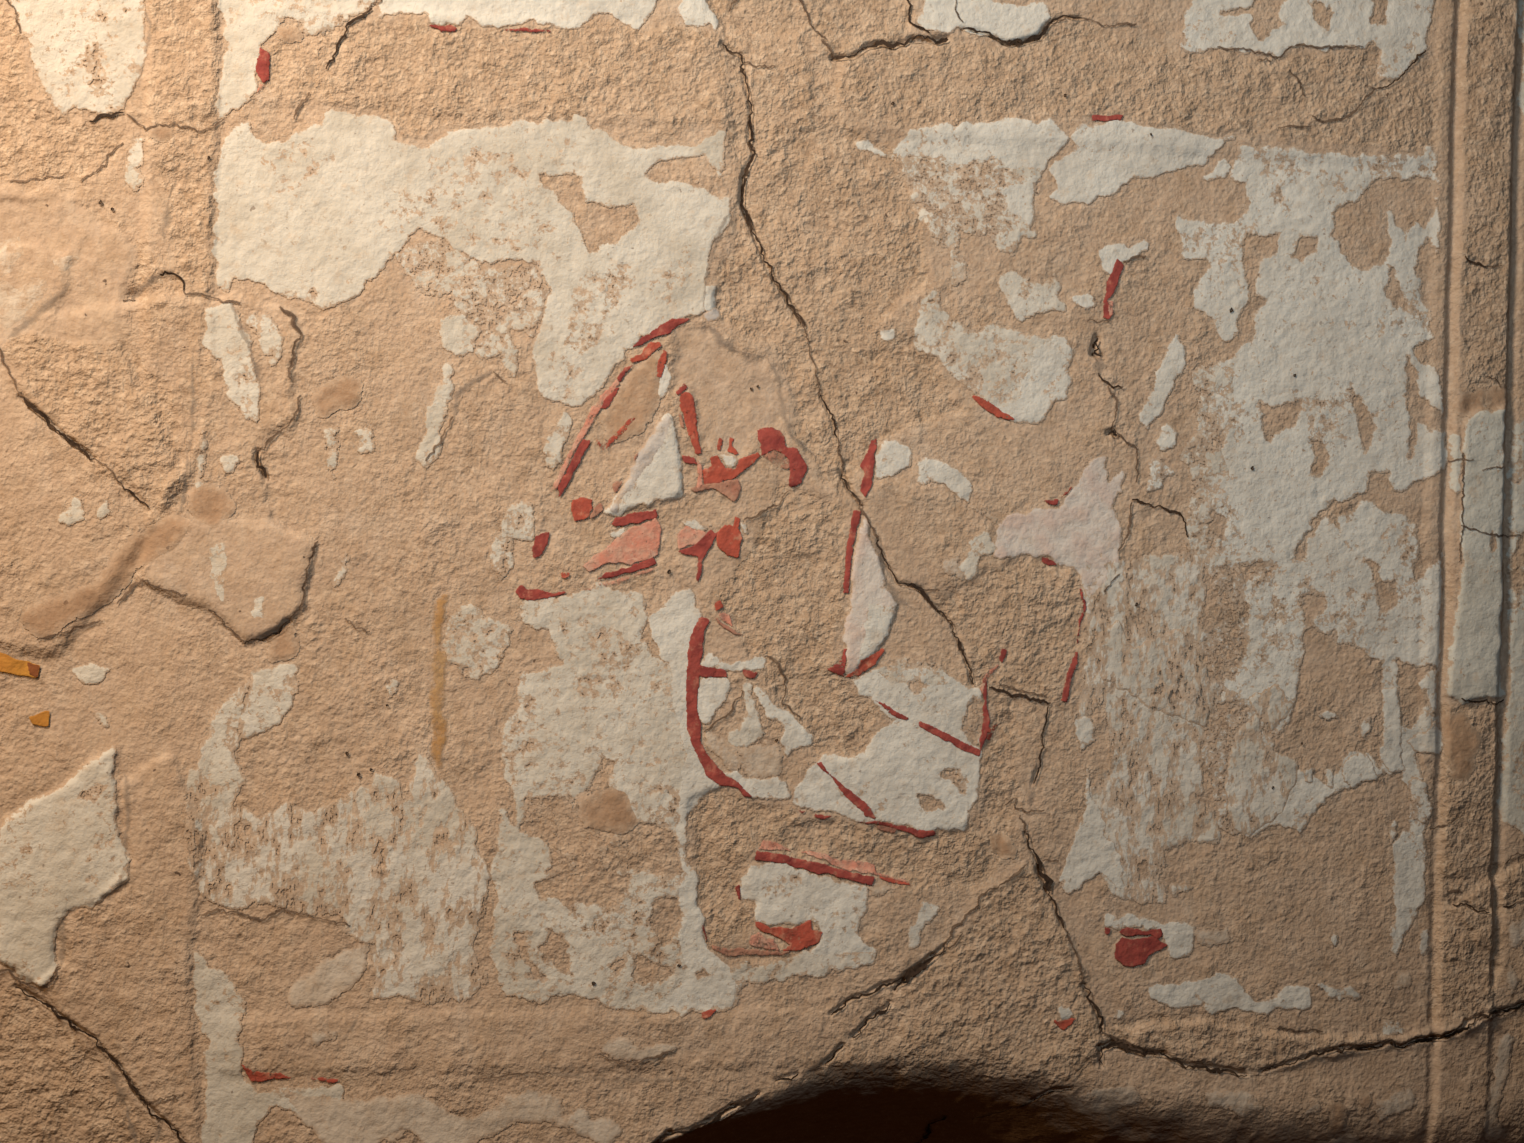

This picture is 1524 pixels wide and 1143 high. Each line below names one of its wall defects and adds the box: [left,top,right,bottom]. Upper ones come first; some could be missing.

crack [0,349,149,507]
peeling [0,712,181,1143]
crack [0,966,186,1143]
crack [10,112,224,183]
crack [256,306,303,478]
crack [294,0,382,119]
peeling [192,949,623,1143]
peeling [0,0,1451,905]
peeling [182,581,1404,1093]
crack [658,0,1524,1143]
flaking render [1388,398,1524,1031]
flaking render [1451,0,1524,393]